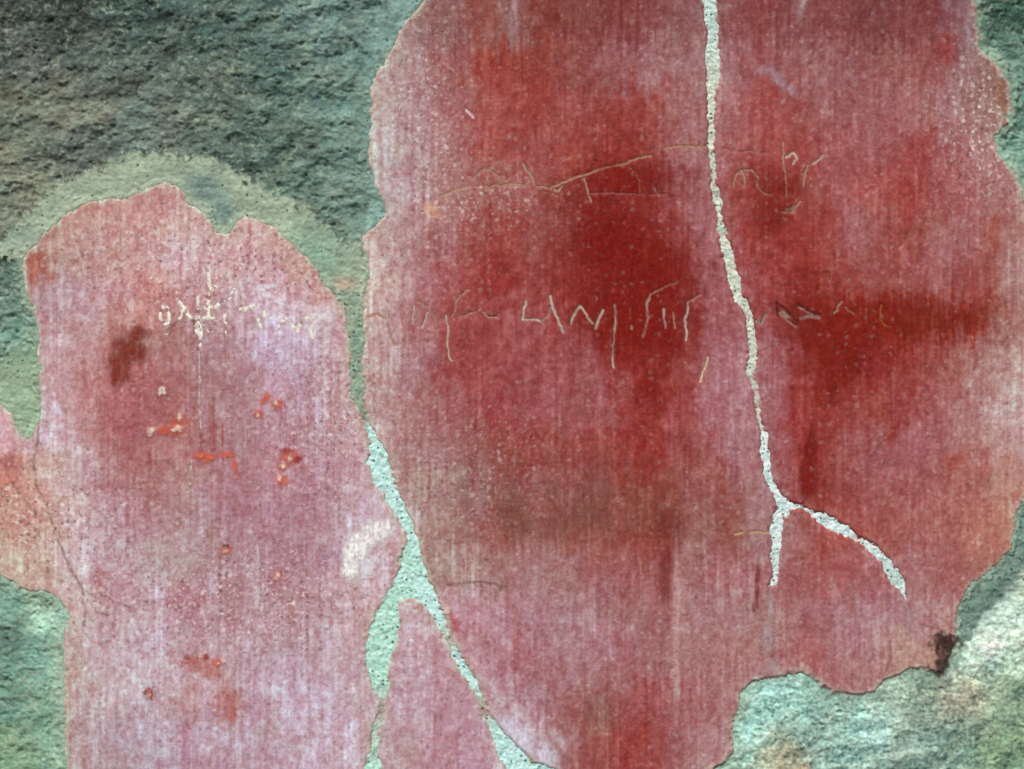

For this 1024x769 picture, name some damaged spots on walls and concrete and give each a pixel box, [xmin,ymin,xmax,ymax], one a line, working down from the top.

spalling [0,0,424,439]
crack [702,0,907,600]
spalling [0,576,70,769]
spalling [715,502,1024,769]